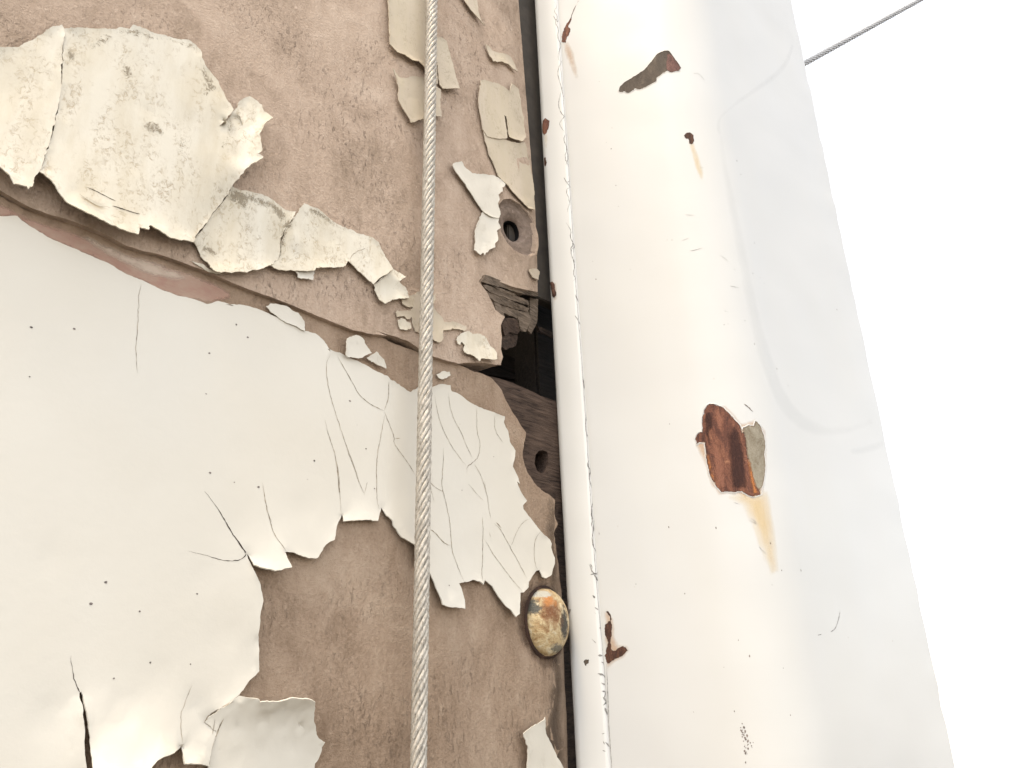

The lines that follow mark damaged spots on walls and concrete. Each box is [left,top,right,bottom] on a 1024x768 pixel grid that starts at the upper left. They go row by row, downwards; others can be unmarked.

peeling [387,0,460,123]
peeling [464,0,484,26]
peeling [452,45,535,255]
spalling [433,268,553,361]
peeling [0,25,420,768]
crack [198,492,246,561]
crack [325,356,538,585]
peeling [427,371,563,768]
corrosion [694,403,766,498]
corrosion [605,611,628,663]